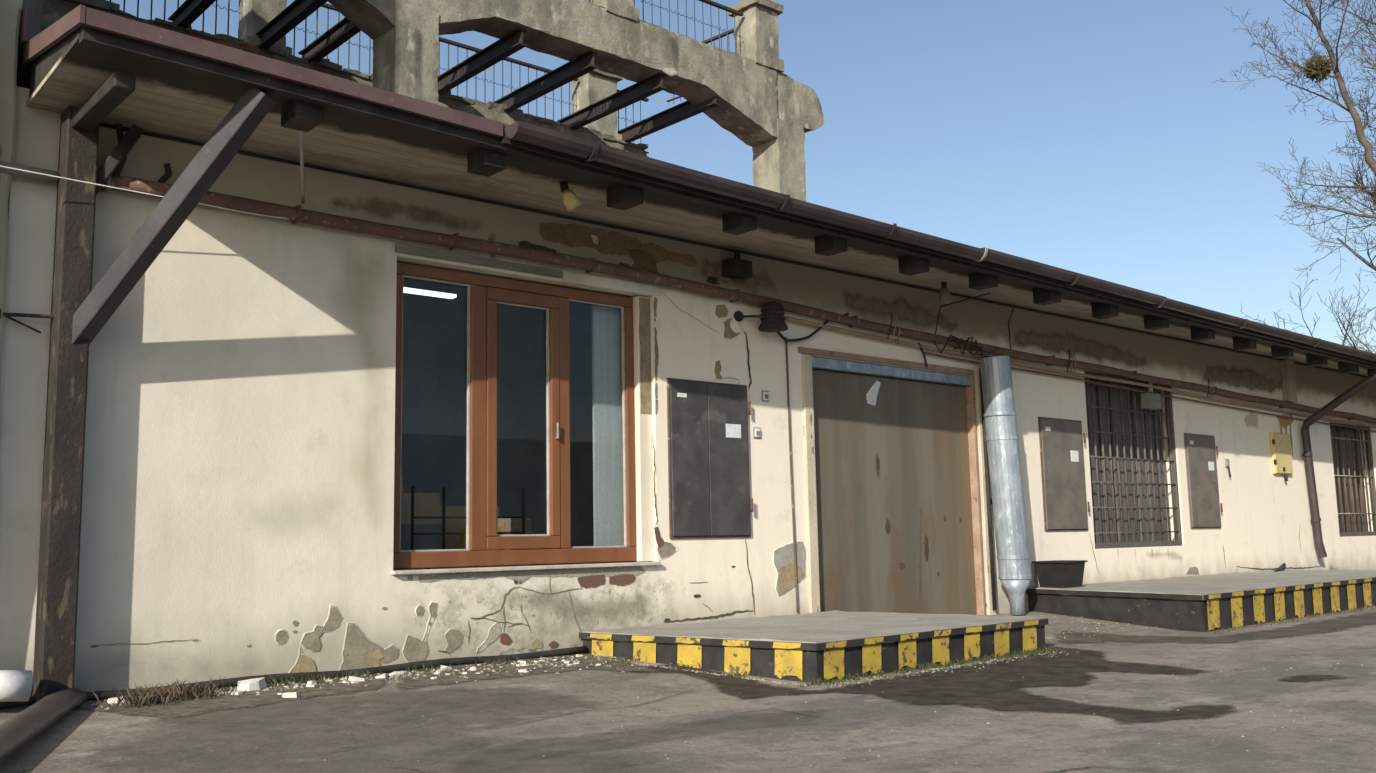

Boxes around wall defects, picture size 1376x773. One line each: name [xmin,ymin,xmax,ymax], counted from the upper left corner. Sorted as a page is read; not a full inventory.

peeling [510,223,697,273]
peeling [714,303,744,341]
peeling [713,359,725,380]
spalling [408,566,645,588]
spalling [654,527,679,561]
spalling [773,540,807,598]
peeling [274,601,578,673]
crack [440,575,582,654]